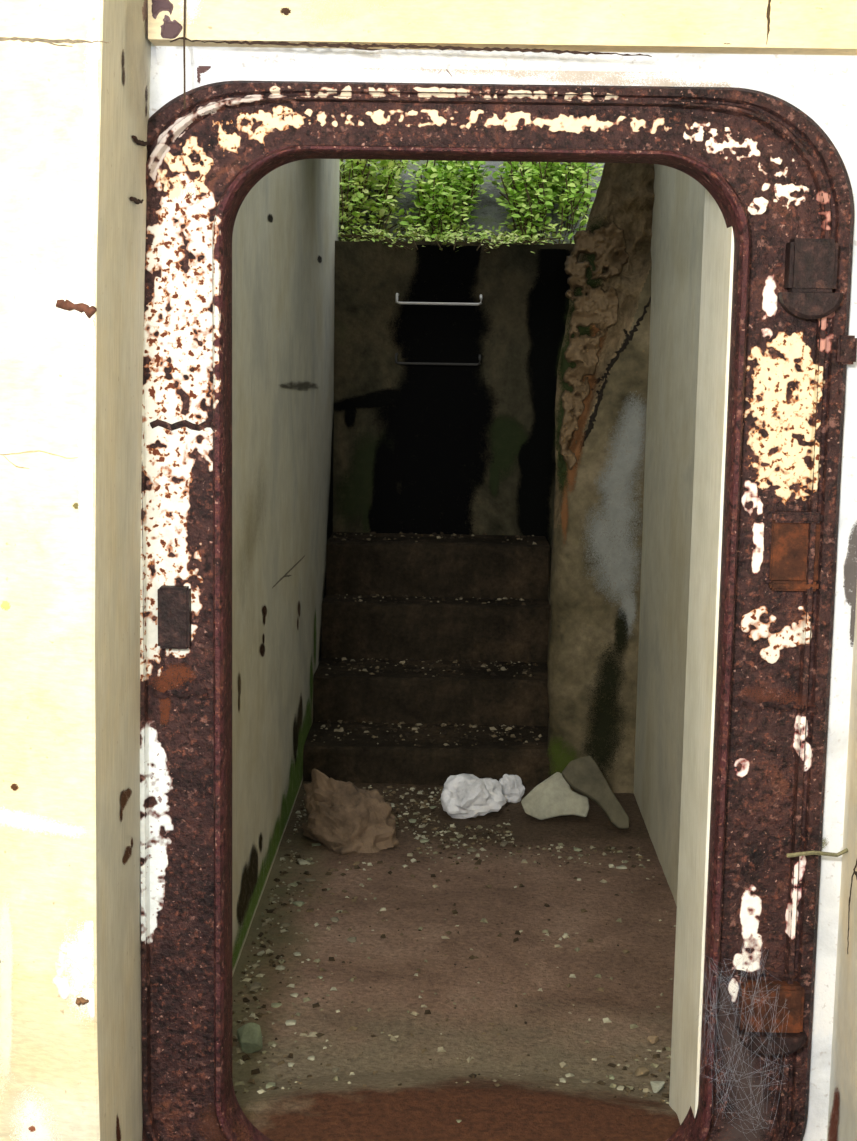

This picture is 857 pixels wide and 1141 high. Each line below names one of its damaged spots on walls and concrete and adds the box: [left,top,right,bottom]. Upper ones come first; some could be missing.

crack [0,37,111,47]
crack [764,0,772,45]
peeling [140,85,835,682]
rust [560,324,608,544]
rust [259,606,268,657]
rust [146,663,197,725]
peeling [140,721,174,944]
rust [828,1087,840,1141]